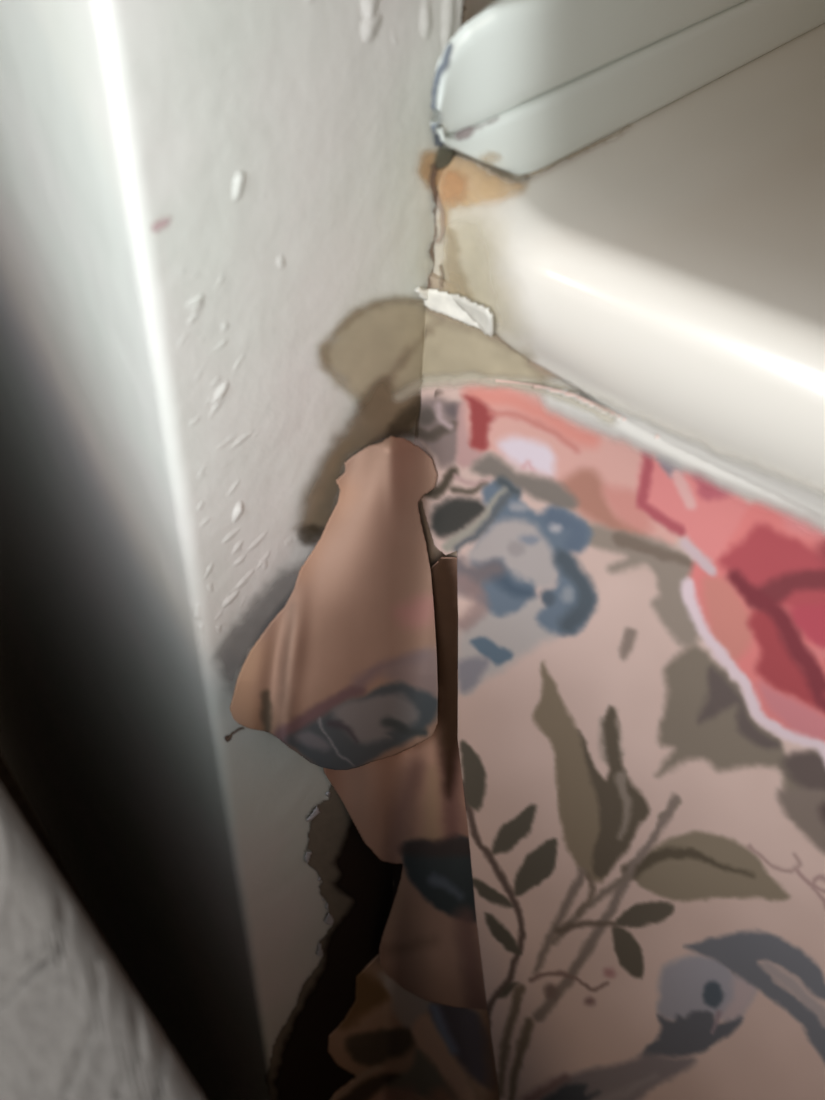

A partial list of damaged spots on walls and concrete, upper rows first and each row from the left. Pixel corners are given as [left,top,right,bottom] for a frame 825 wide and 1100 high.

crack [428,43,620,288]
damp [299,300,557,545]
peeling [415,287,495,337]
spalling [266,785,403,1100]